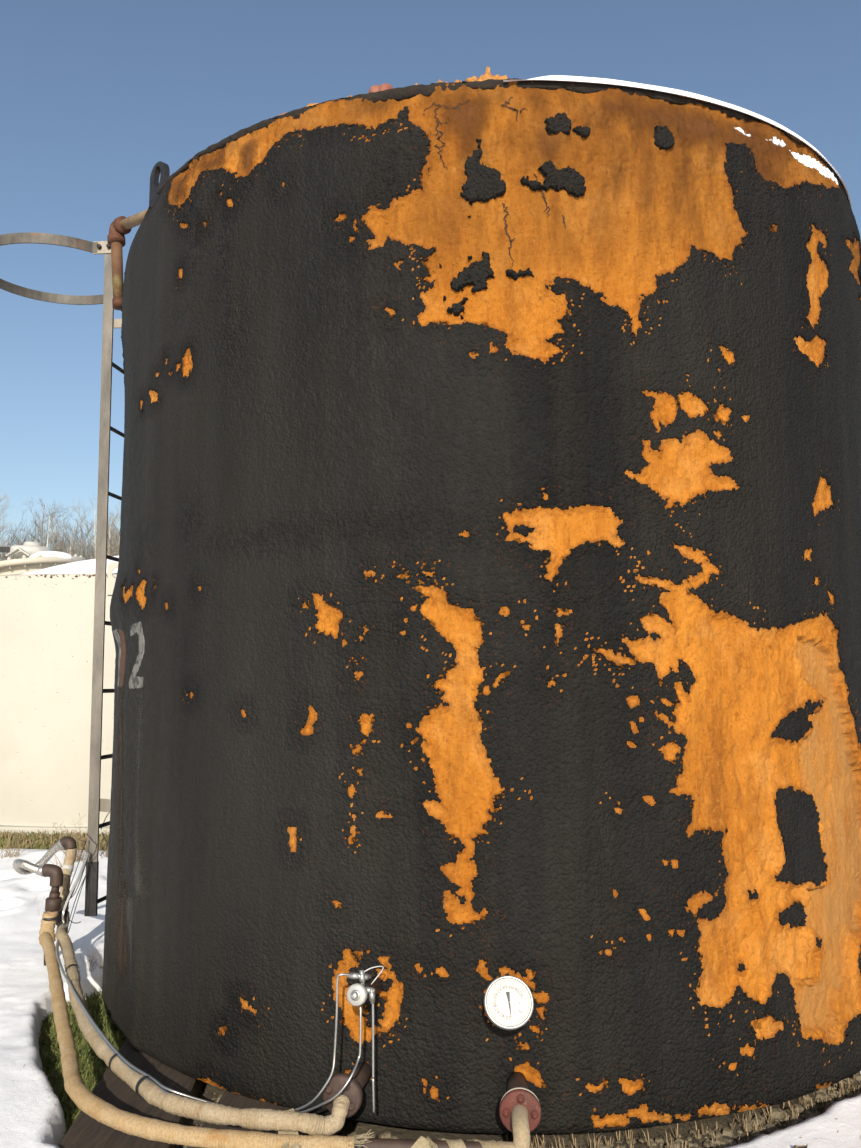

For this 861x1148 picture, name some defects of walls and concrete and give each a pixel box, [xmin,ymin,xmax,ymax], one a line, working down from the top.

peeling [165,79,839,367]
peeling [845,237,861,300]
peeling [156,348,193,377]
peeling [123,569,156,610]
peeling [298,593,369,681]
peeling [364,560,533,937]
peeling [496,345,861,1076]
peeling [321,948,408,1047]
peeling [415,963,449,978]
peeling [476,960,549,1088]
peeling [576,1074,769,1128]